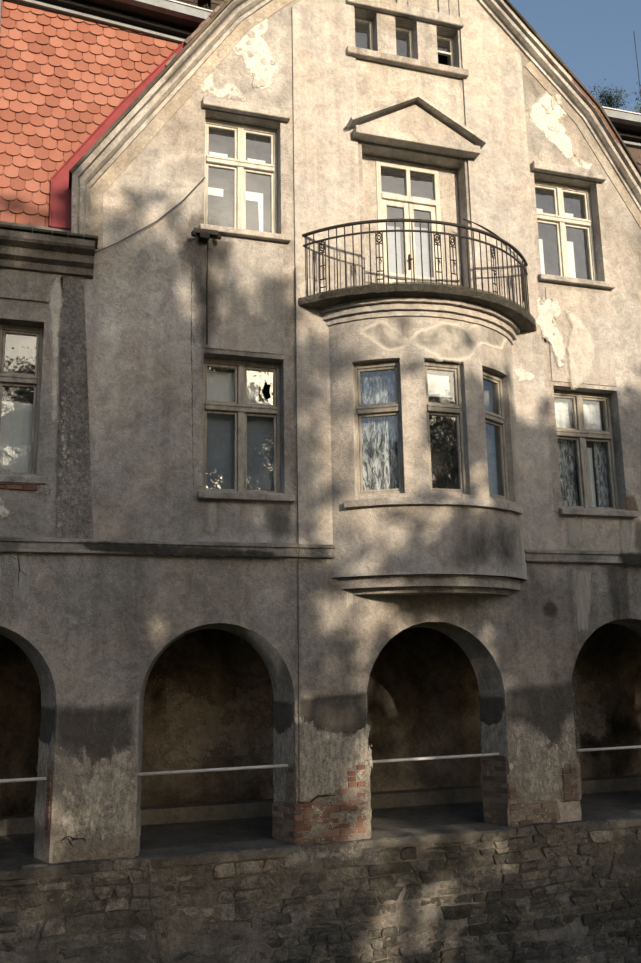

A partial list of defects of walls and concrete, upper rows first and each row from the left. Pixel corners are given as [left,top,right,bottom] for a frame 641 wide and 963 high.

peeling [197,71,246,101]
peeling [213,19,279,89]
peeling [529,91,592,169]
peeling [536,296,565,367]
peeling [0,359,88,528]
leakage [39,708,131,770]
peeling [34,731,140,864]
leakage [273,693,367,735]
flaking render [272,713,373,846]
leakage [479,682,575,748]
peeling [480,673,608,827]